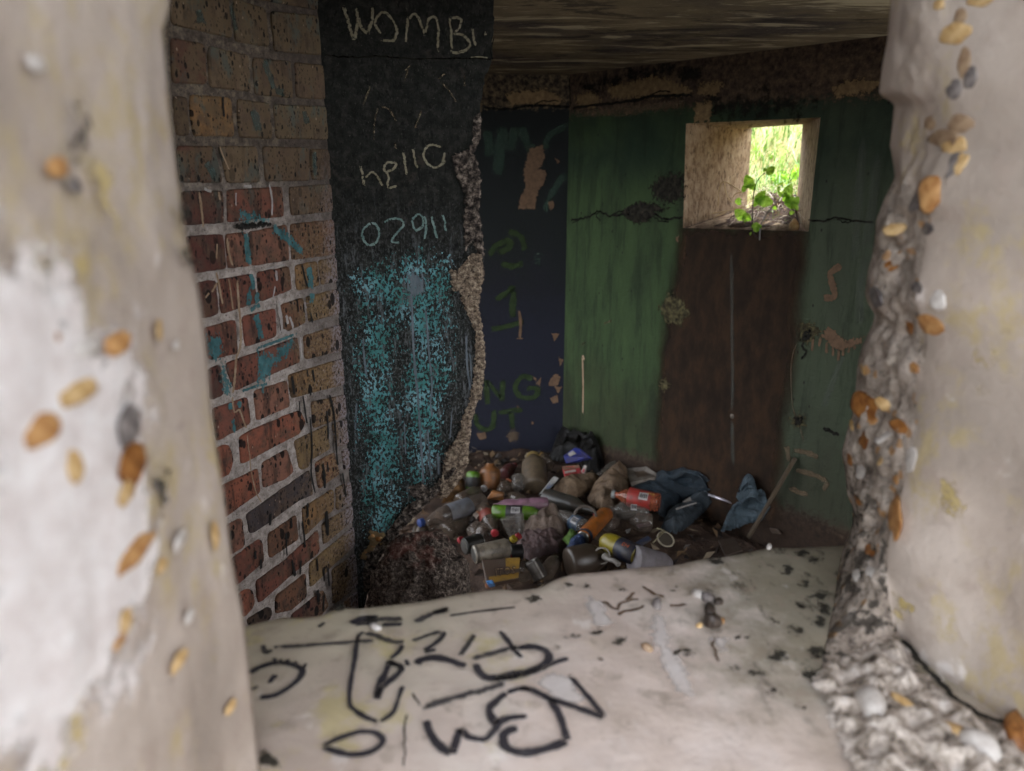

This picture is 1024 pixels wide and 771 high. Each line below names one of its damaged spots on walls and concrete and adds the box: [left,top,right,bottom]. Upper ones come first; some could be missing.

peeling [518,145,560,211]
crack [571,210,682,224]
crack [808,216,873,224]
peeling [344,112,486,594]
peeling [534,358,563,403]
crack [901,640,1004,724]